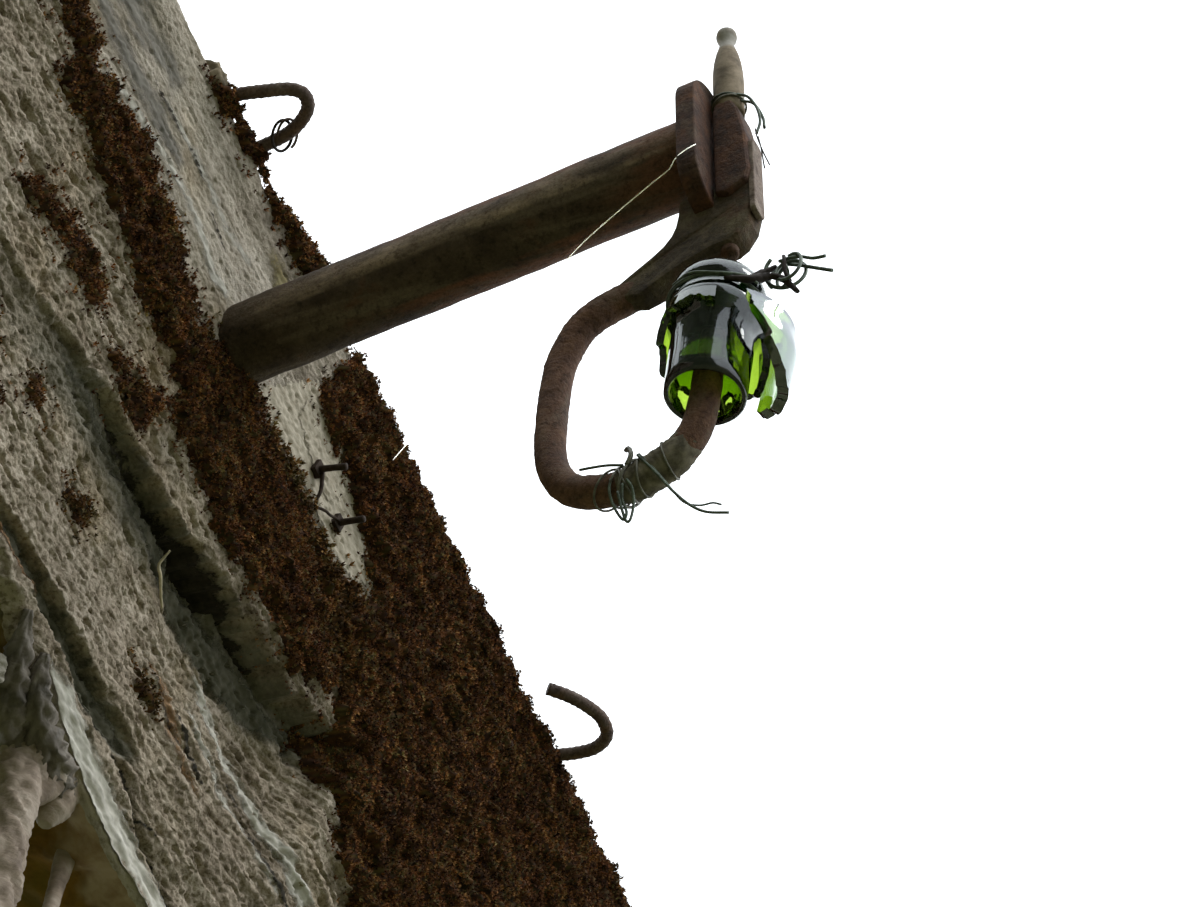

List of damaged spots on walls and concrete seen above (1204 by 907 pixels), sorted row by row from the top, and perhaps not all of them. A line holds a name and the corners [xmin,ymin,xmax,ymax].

spalling [3,521,128,754]